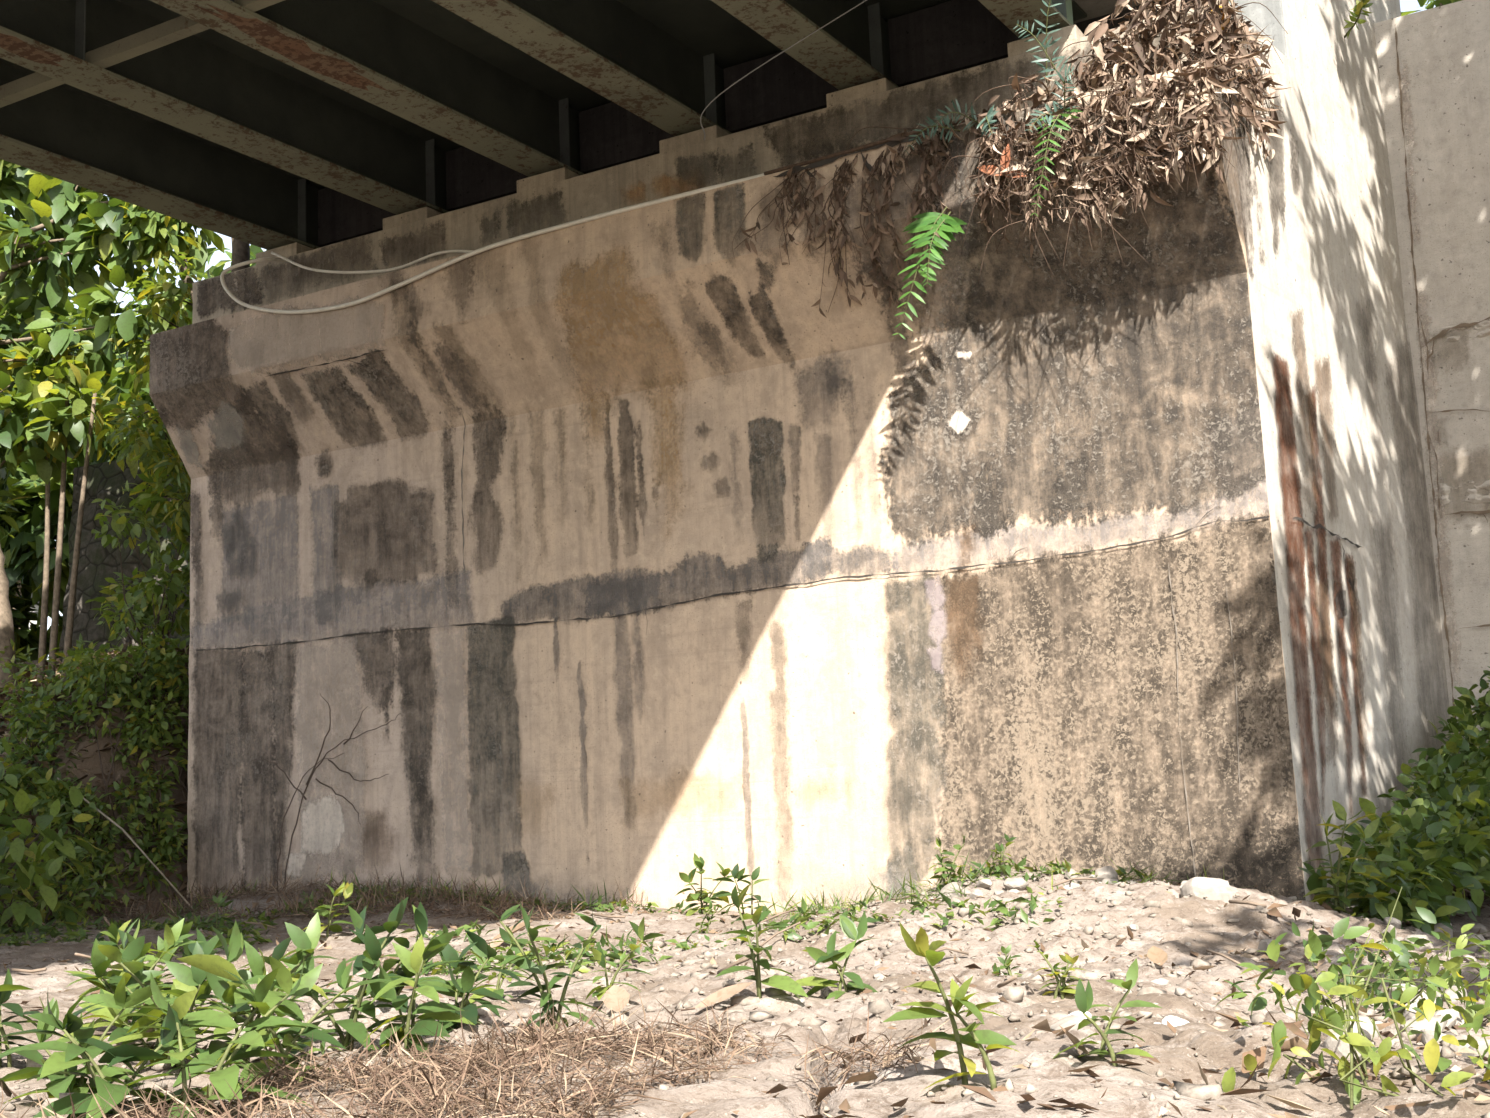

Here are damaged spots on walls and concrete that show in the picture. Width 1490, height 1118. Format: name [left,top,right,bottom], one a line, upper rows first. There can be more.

water stain [197,221,445,318]
water stain [393,282,475,398]
water stain [479,191,564,234]
water stain [662,143,755,261]
water stain [694,259,838,409]
water stain [876,273,917,371]
crack [1395,27,1490,754]
water stain [190,349,1270,901]
crack [189,411,1361,877]
corrosion [1274,353,1367,900]
water stain [1115,832,1305,901]